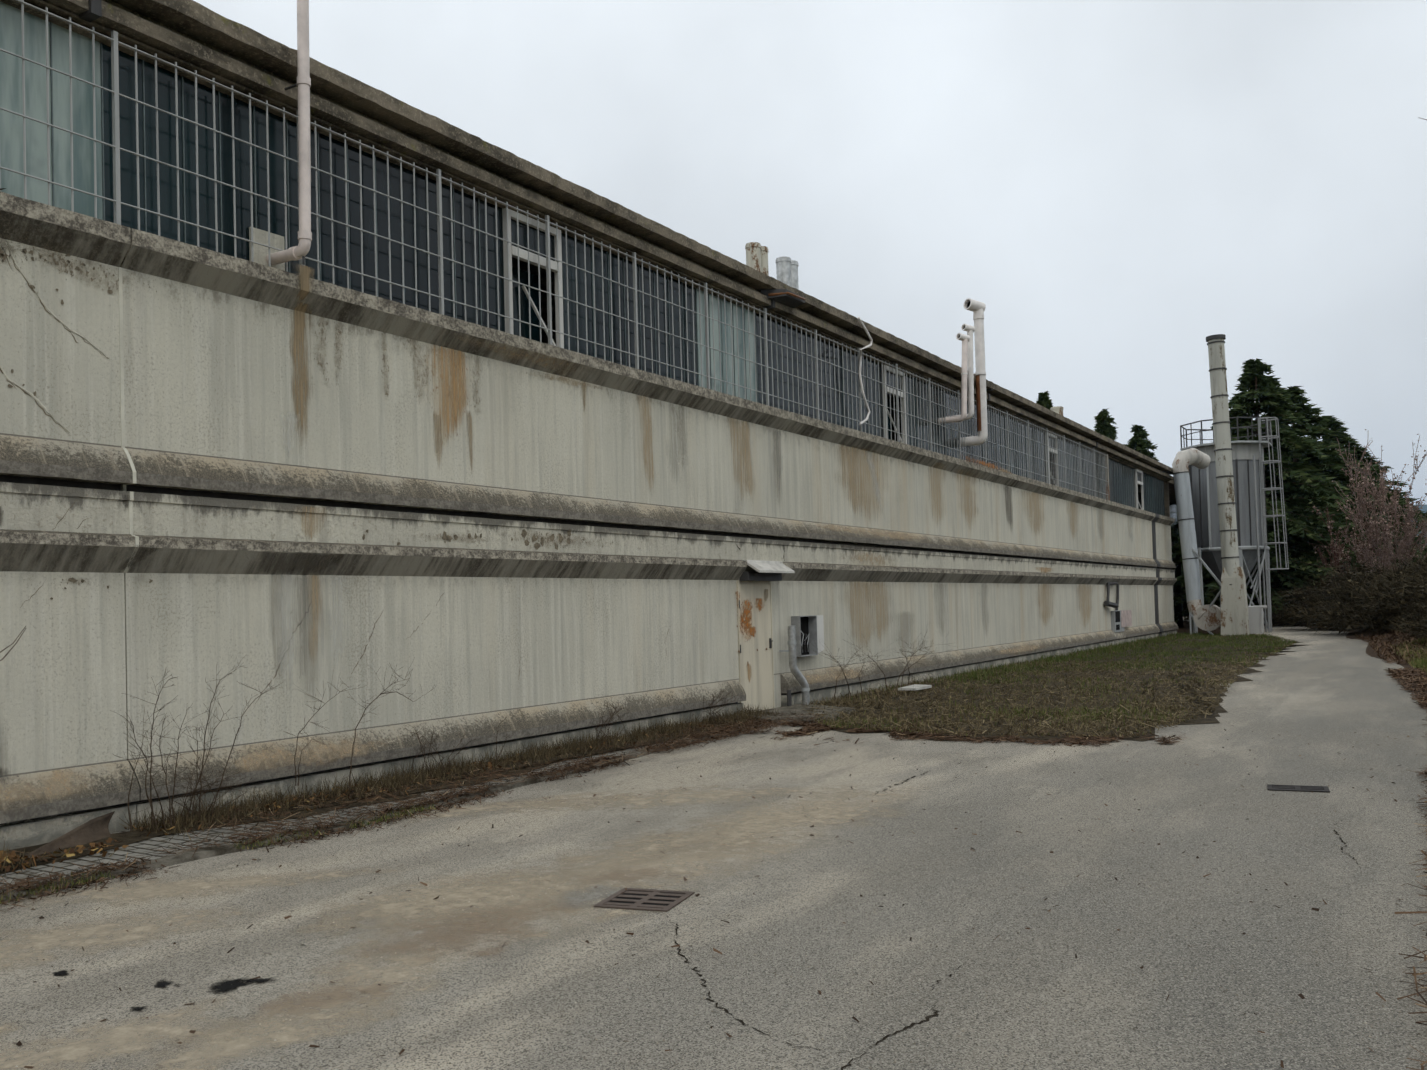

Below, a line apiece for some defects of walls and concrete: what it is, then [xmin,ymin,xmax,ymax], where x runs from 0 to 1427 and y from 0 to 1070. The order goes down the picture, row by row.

crack [1,241,109,359]
crack [0,366,70,433]
rust [425,345,472,468]
rust [736,590,768,682]
crack [667,915,964,1070]